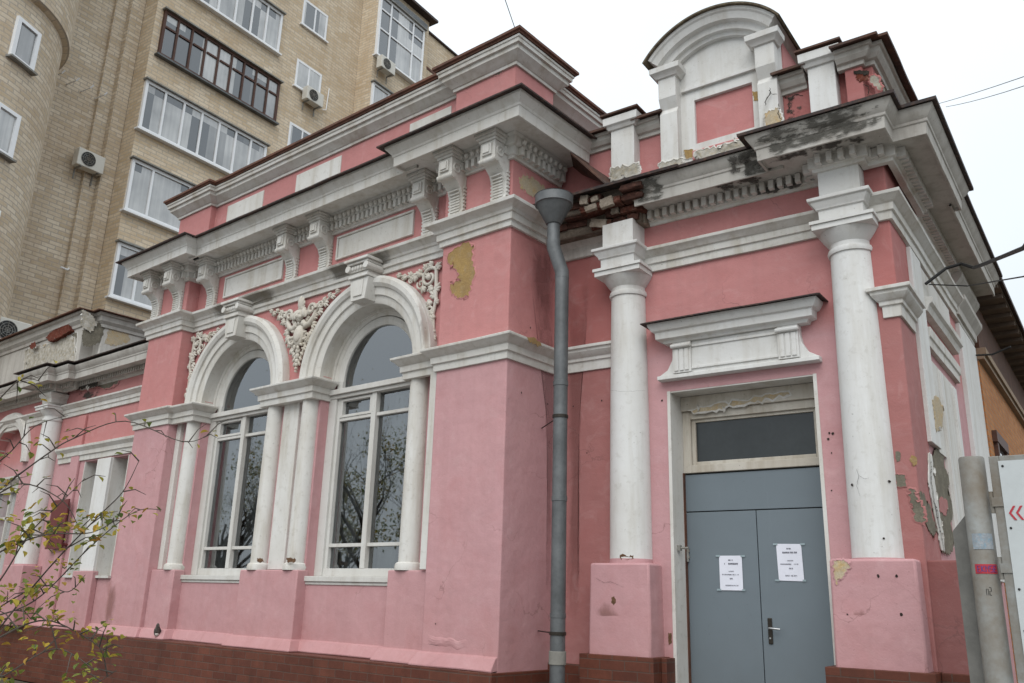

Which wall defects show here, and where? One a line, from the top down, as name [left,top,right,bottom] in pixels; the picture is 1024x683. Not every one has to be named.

peeling [854,70,886,92]
peeling [763,106,784,126]
water stain [716,96,881,195]
peeling [609,161,642,182]
flaking render [560,190,648,232]
peeling [446,240,477,300]
peeling [687,390,792,415]
peeling [932,396,945,432]
peeling [895,448,954,556]